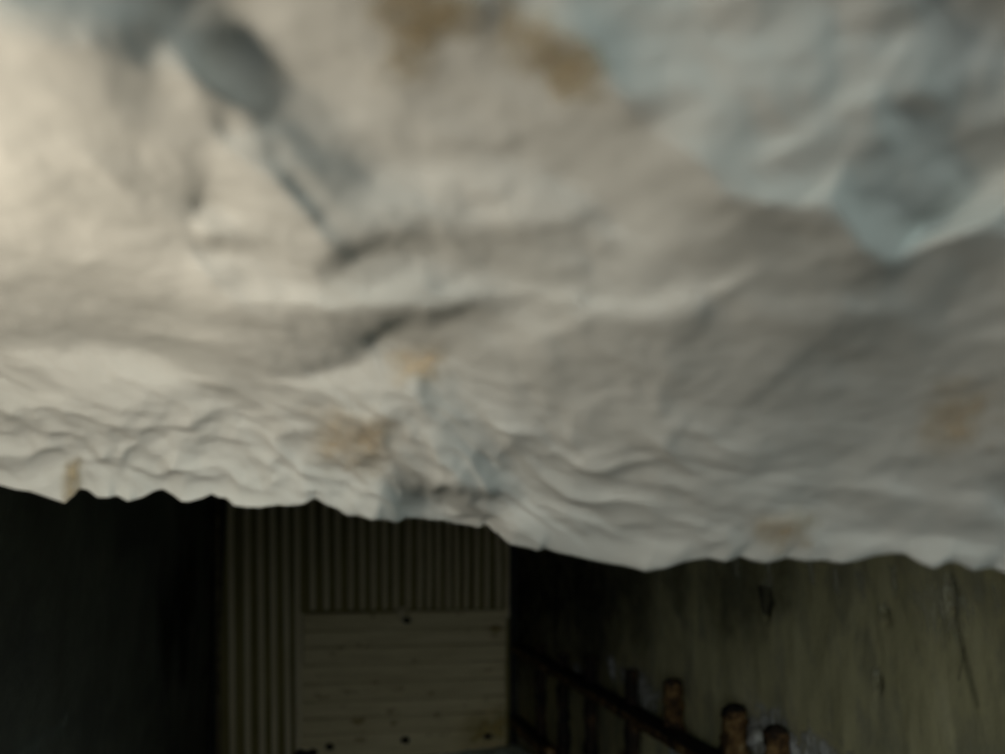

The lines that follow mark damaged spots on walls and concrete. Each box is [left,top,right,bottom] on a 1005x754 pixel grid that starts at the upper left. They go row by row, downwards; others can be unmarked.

efflorescence [747,705,836,754]